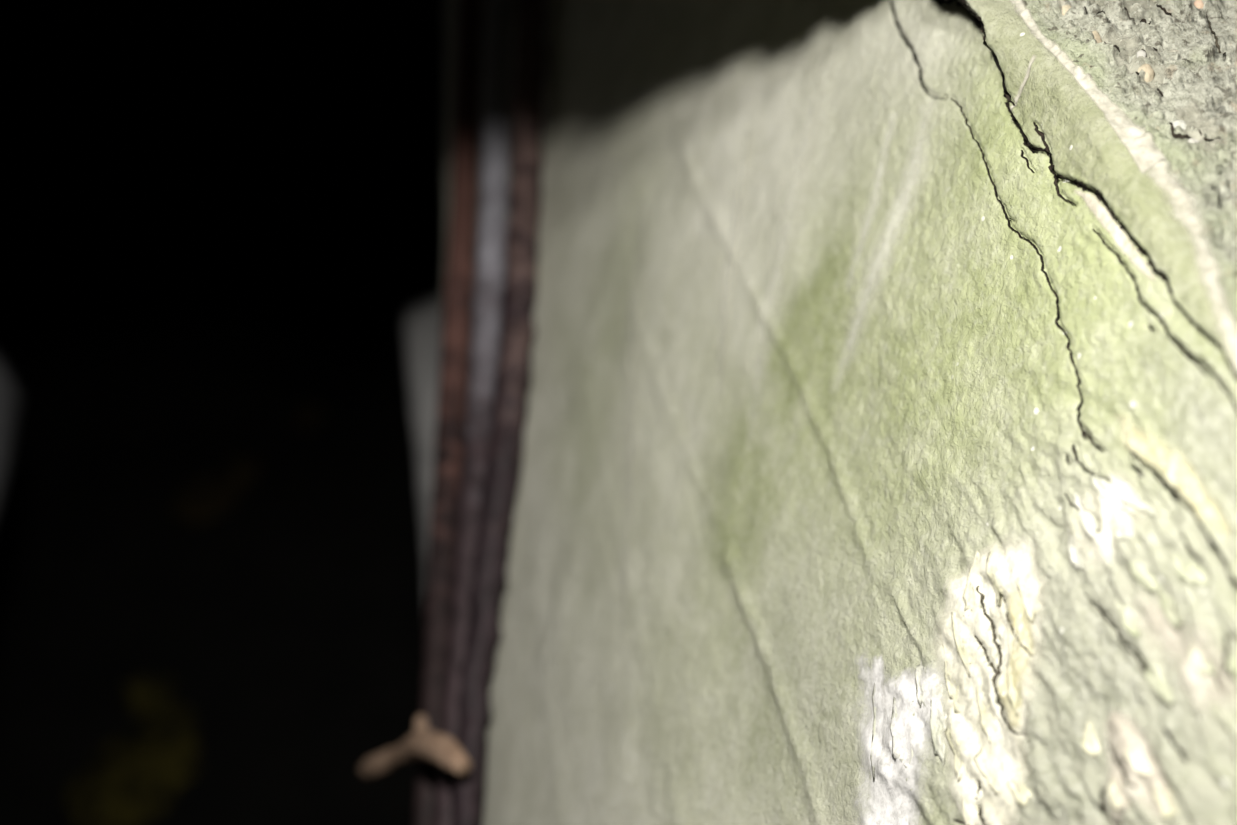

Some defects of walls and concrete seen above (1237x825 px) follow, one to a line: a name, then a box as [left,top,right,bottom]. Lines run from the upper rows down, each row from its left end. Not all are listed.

crack [889,0,1237,585]
peeling [1065,475,1156,569]
peeling [1169,549,1208,586]
peeling [936,543,1043,825]
crack [974,585,1034,735]
crack [1090,600,1146,673]
peeling [1113,560,1237,735]
crack [1211,634,1234,693]
water stain [860,657,947,825]
peeling [1082,713,1179,822]
crack [1163,728,1187,761]